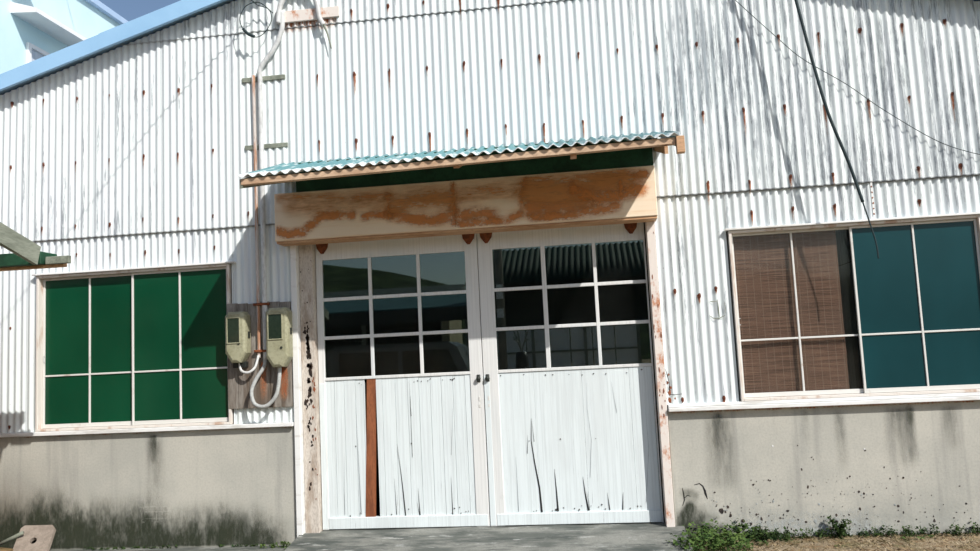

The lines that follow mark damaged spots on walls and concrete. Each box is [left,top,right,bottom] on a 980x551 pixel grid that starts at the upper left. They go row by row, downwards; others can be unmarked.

rust [286,18,336,30]
leakage [950,47,980,138]
peeling [303,321,316,447]
leakage [897,408,913,428]
leakage [740,519,835,536]